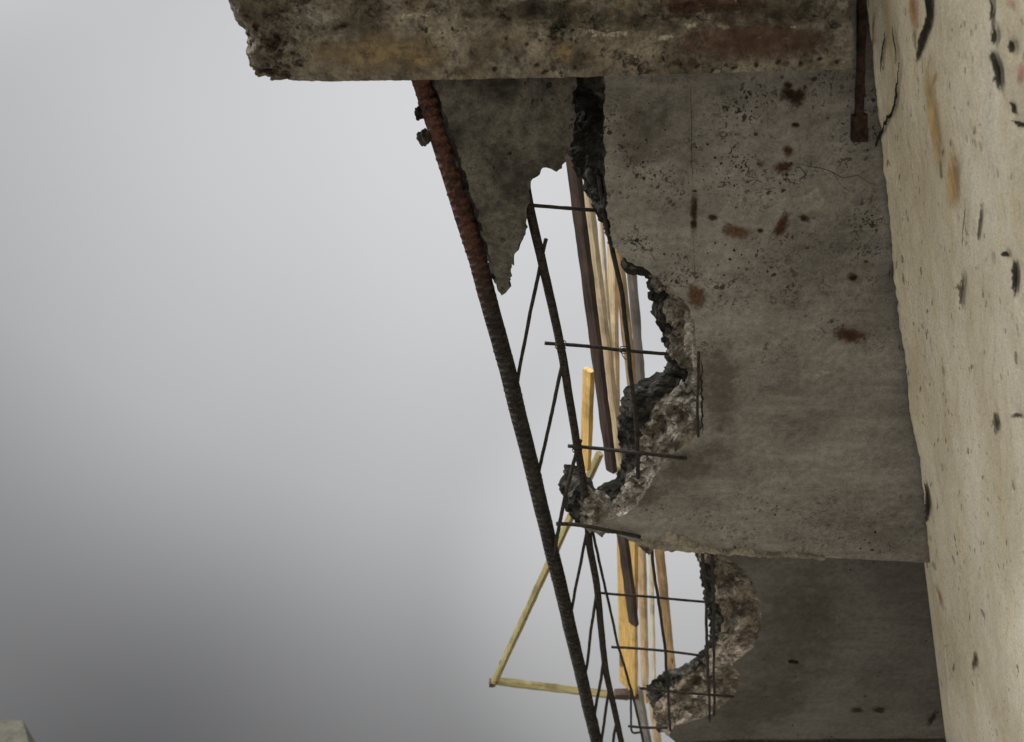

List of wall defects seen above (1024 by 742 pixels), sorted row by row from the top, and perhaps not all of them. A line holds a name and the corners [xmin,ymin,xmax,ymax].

corrosion [780,83,805,108]
crack [874,26,900,148]
corrosion [690,197,809,238]
corrosion [836,328,866,344]